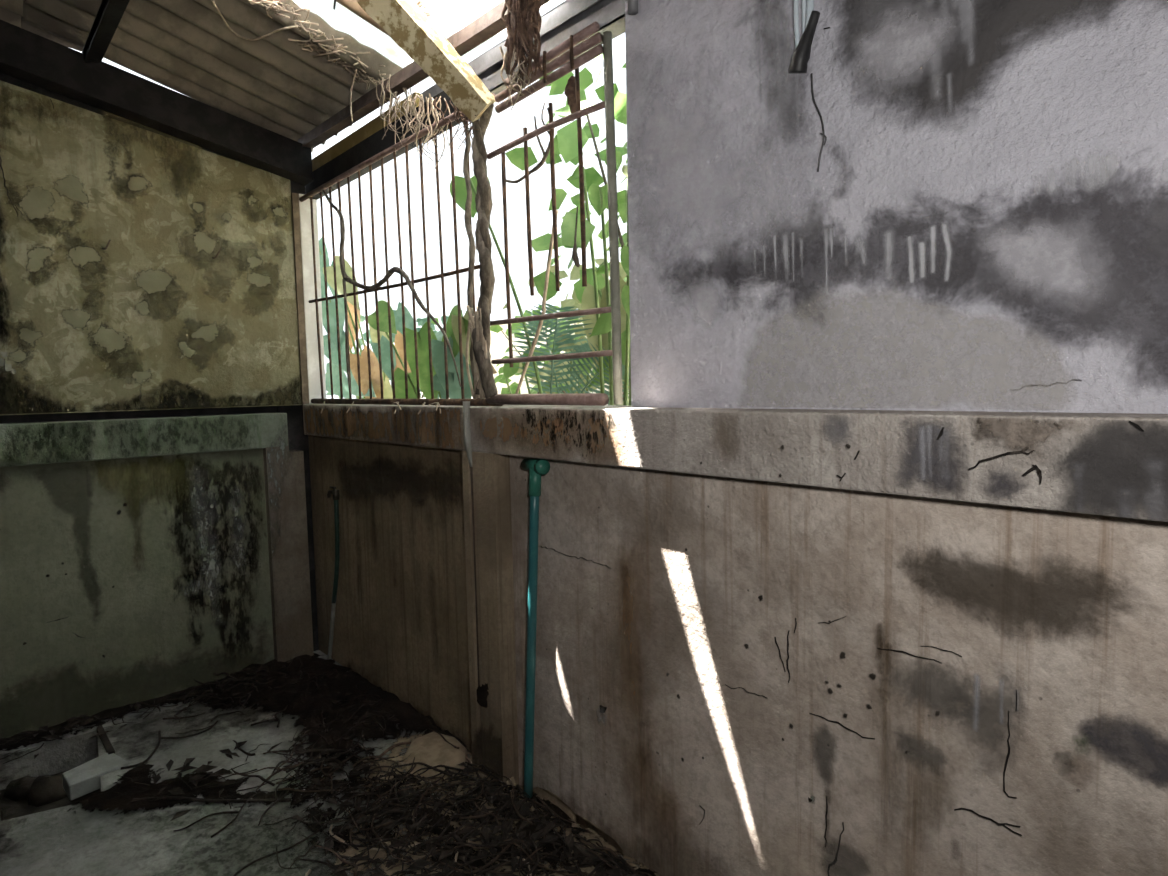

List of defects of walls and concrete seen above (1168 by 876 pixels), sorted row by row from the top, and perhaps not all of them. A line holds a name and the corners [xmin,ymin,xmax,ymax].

leakage [842,0,1117,118]
peeling [8,175,152,385]
peeling [135,269,235,369]
peeling [179,189,287,314]
leakage [669,155,1168,383]
leakage [93,377,463,505]
corrosion [475,413,623,461]
crack [969,448,1042,484]
leakage [905,552,1114,634]
crack [954,690,1022,836]
leakage [1081,718,1168,786]
crack [824,796,844,876]